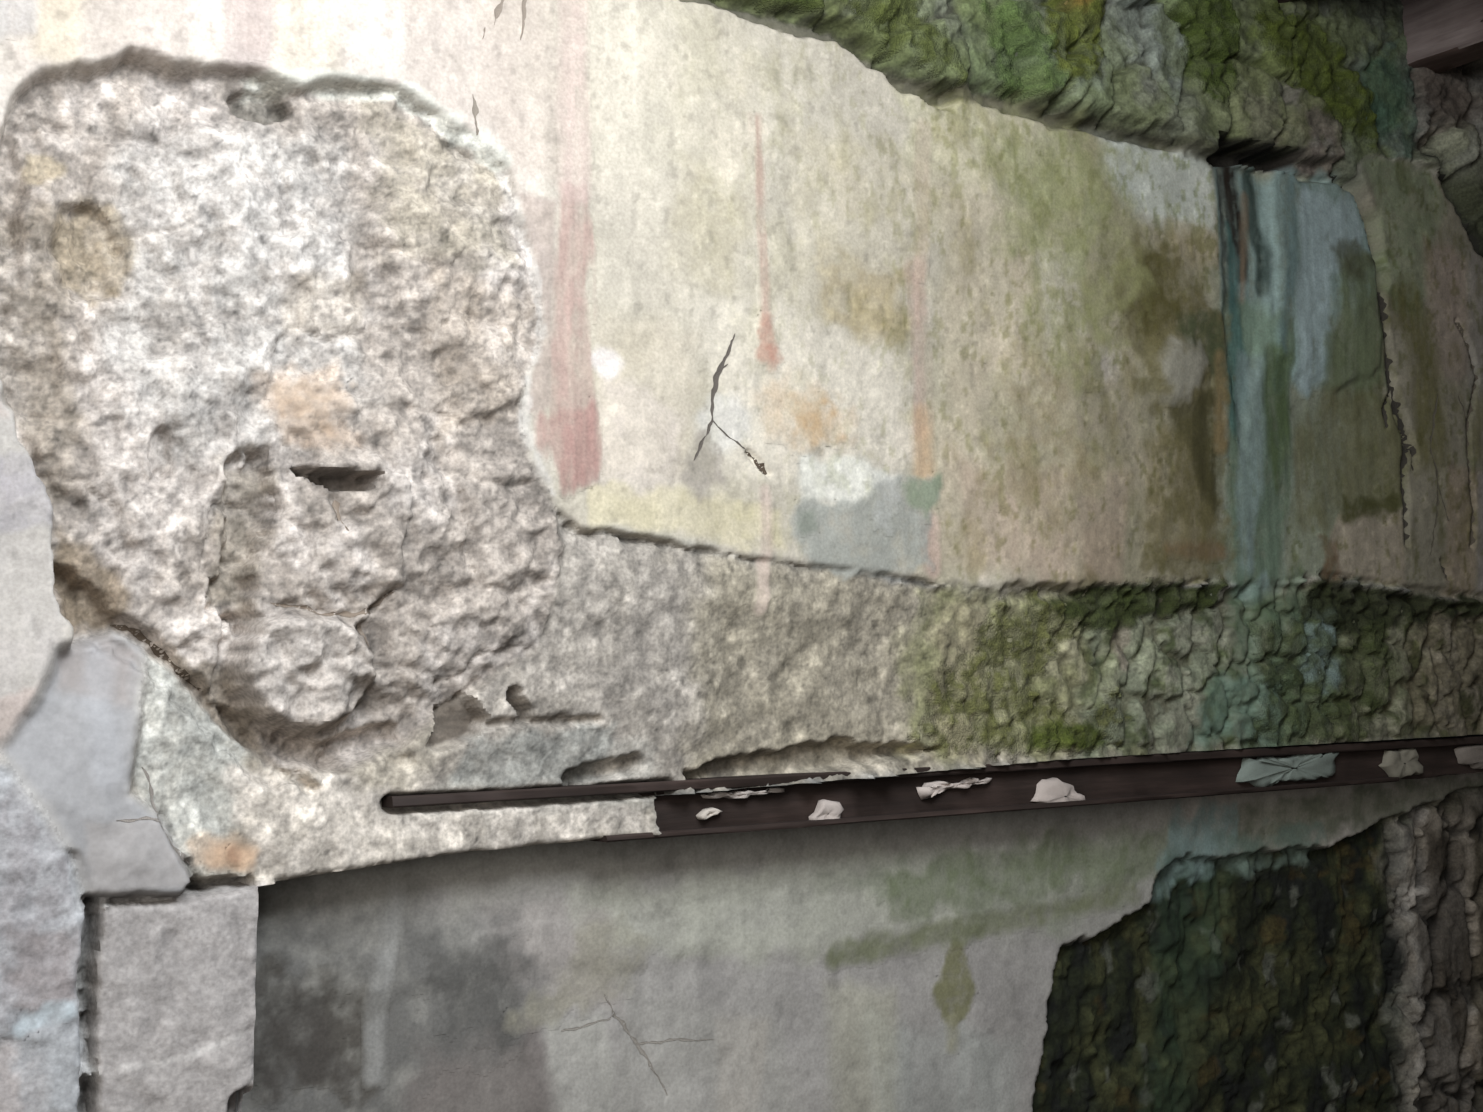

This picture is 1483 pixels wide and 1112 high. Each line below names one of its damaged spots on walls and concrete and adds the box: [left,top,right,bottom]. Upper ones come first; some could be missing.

crack [483,0,527,40]
crack [1438,174,1481,256]
spalling [0,55,1232,885]
crack [694,334,746,460]
damp [1159,161,1370,752]
crack [1377,292,1478,555]
spalling [1352,596,1483,742]
spalling [1032,904,1155,1112]
spalling [1191,785,1483,1112]